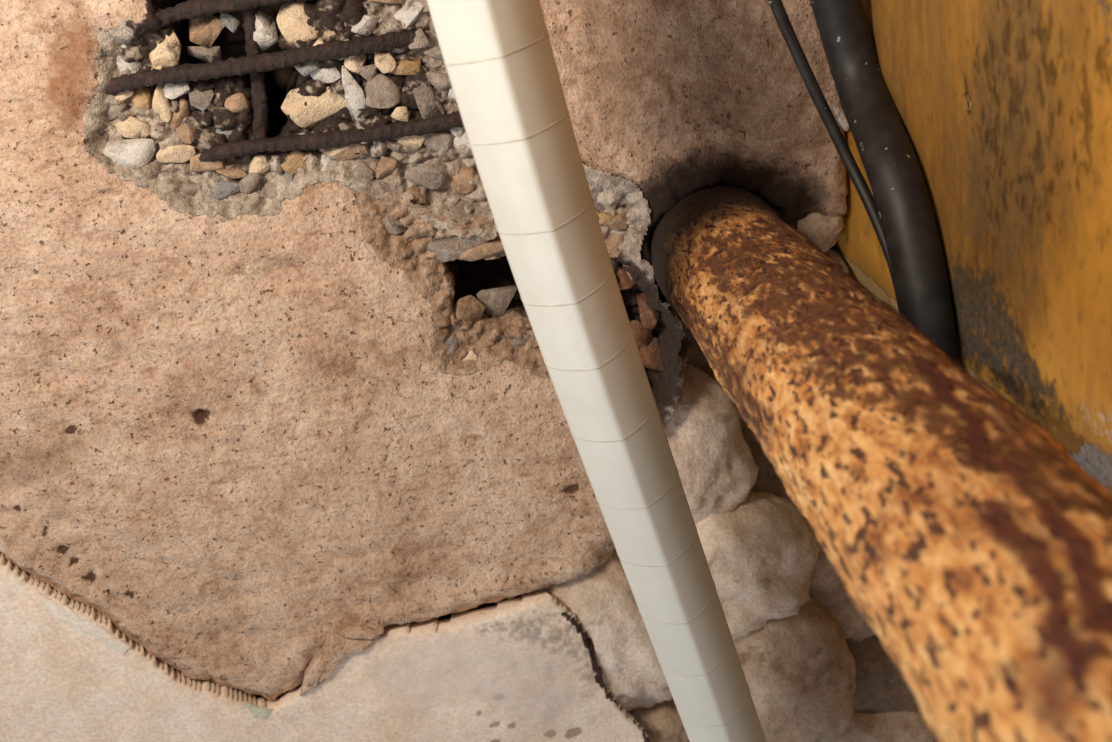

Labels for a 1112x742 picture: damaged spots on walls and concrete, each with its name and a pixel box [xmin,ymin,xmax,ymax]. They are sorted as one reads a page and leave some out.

spalling [82,0,550,378]
spalling [583,164,685,427]
peeling [838,248,899,315]
spalling [561,484,578,494]
peeling [1068,438,1112,493]
spalling [57,546,78,566]
peeling [38,592,131,655]
flaking render [300,623,384,696]
crack [561,612,650,742]